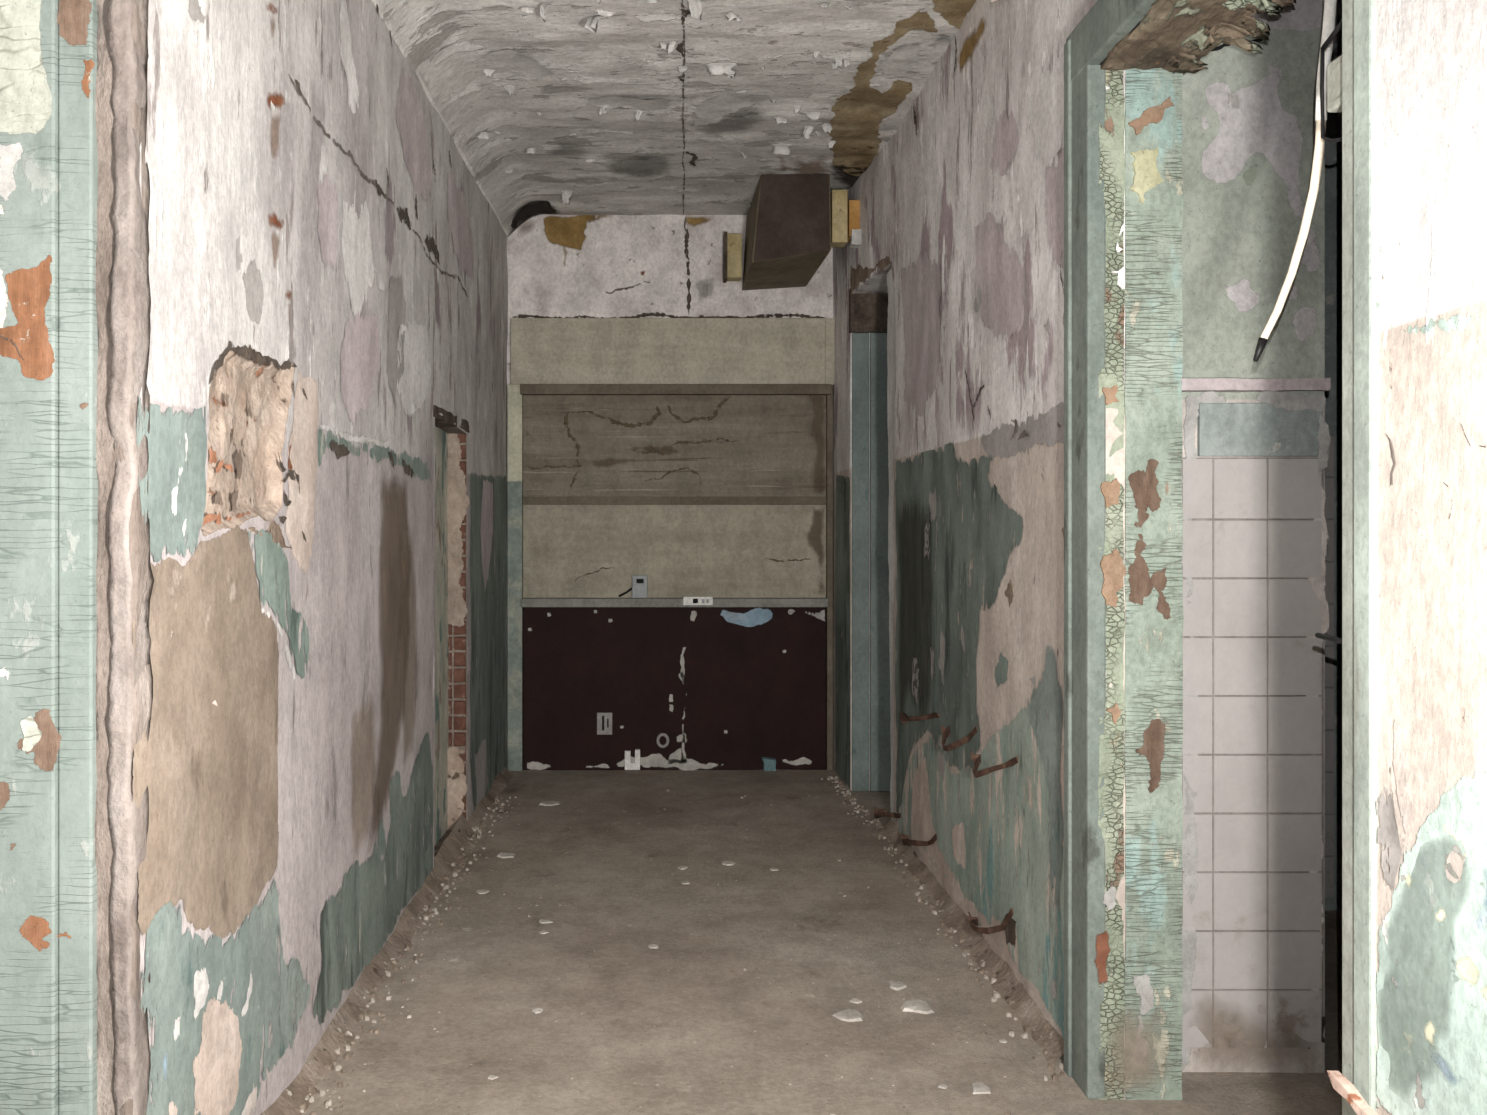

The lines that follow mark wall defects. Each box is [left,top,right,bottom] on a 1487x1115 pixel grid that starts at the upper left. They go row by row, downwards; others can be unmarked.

crack [289,75,468,297]
crack [513,0,825,318]
damp [832,165,868,188]
peeling [1162,0,1325,272]
flaking render [0,0,507,1115]
crack [528,396,738,490]
peeling [1100,459,1194,620]
flaking render [1256,391,1331,643]
peeling [527,761,550,770]
peeling [586,754,723,770]
peeling [895,402,1064,1039]
peeling [1376,719,1487,1115]